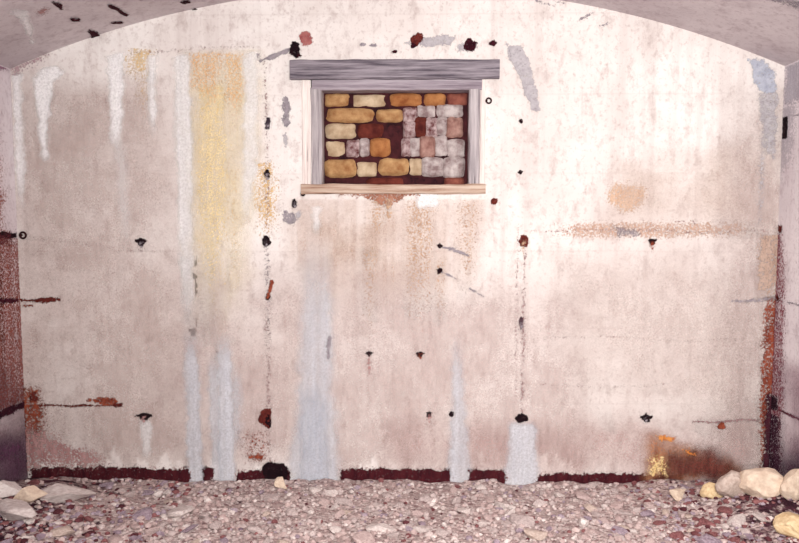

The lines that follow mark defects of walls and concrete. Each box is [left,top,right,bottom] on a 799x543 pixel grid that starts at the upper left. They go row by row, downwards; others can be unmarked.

crack [0,231,17,246]
rust [0,155,110,474]
leakage [0,48,681,485]
rust [756,225,791,475]